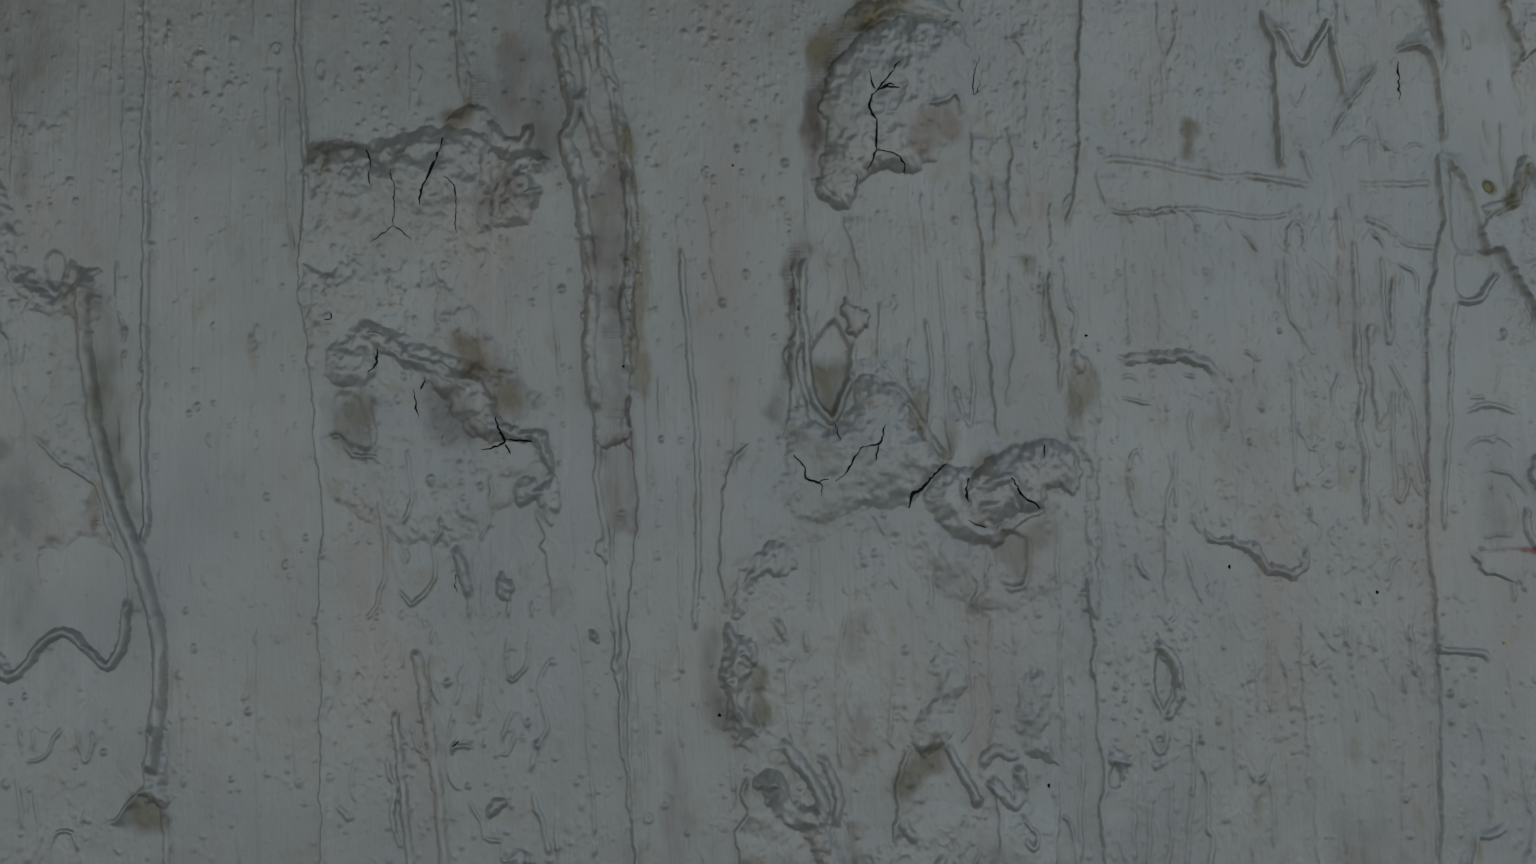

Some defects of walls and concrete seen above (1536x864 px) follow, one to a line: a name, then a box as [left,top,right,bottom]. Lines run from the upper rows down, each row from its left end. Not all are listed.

peeling [1258,9,1326,172]
peeling [1393,0,1536,864]
peeling [0,434,165,684]